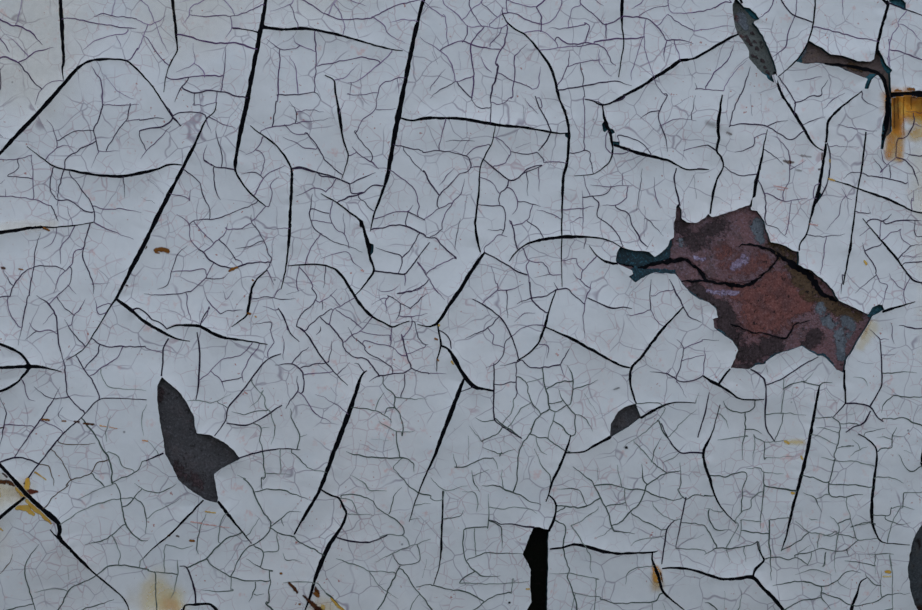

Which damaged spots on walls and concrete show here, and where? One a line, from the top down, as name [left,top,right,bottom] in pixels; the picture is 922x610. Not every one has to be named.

peeling [733,0,778,83]
crack [640,90,683,146]
corrosion [885,87,922,157]
crack [0,154,58,220]
crack [571,174,649,248]
peeling [616,197,883,372]
crack [0,343,62,401]
peeling [157,378,238,502]
corrosion [280,572,344,610]
crack [459,499,536,585]
peeling [523,527,549,610]
peeling [908,525,922,610]